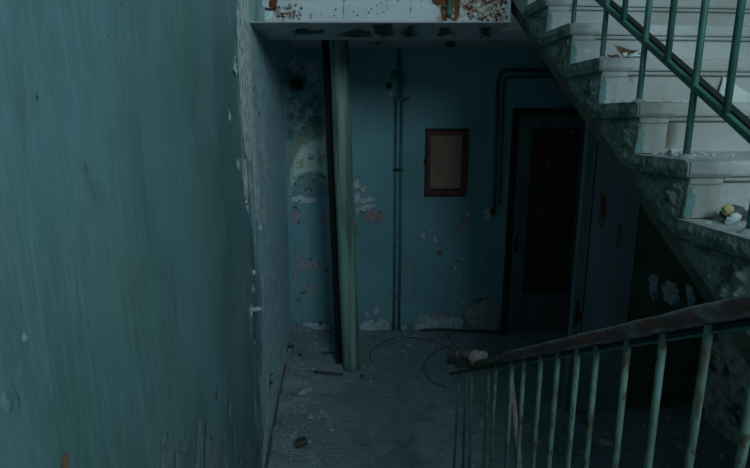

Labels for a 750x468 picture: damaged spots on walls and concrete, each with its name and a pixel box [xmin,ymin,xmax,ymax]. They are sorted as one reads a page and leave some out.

rust [264,0,312,21]
rust [432,0,508,21]
peeling [232,0,268,231]
spalling [523,0,750,301]
peeling [289,136,329,224]
peeling [353,176,384,234]
peeling [648,273,696,308]
peeling [401,311,469,331]